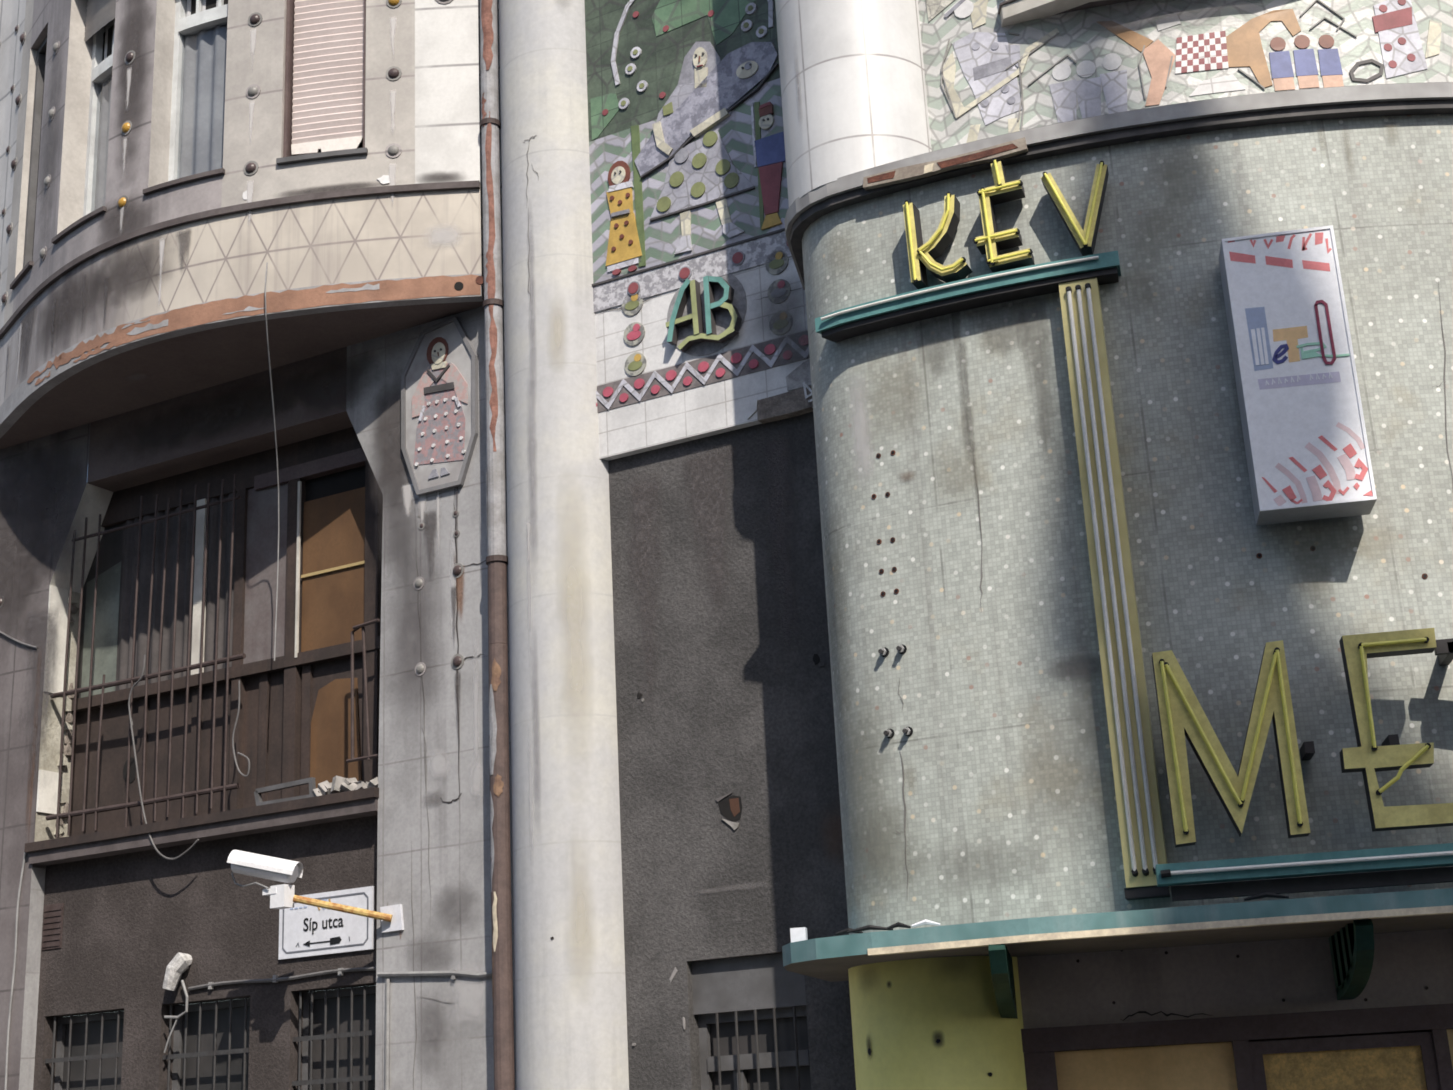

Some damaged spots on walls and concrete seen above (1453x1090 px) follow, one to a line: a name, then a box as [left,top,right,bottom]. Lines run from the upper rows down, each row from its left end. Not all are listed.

corrosion [481,0,494,70]
water stain [159,229,190,300]
corrosion [481,92,498,452]
crack [524,135,539,300]
peeling [27,274,484,385]
hole [715,793,742,830]
crack [892,753,908,892]